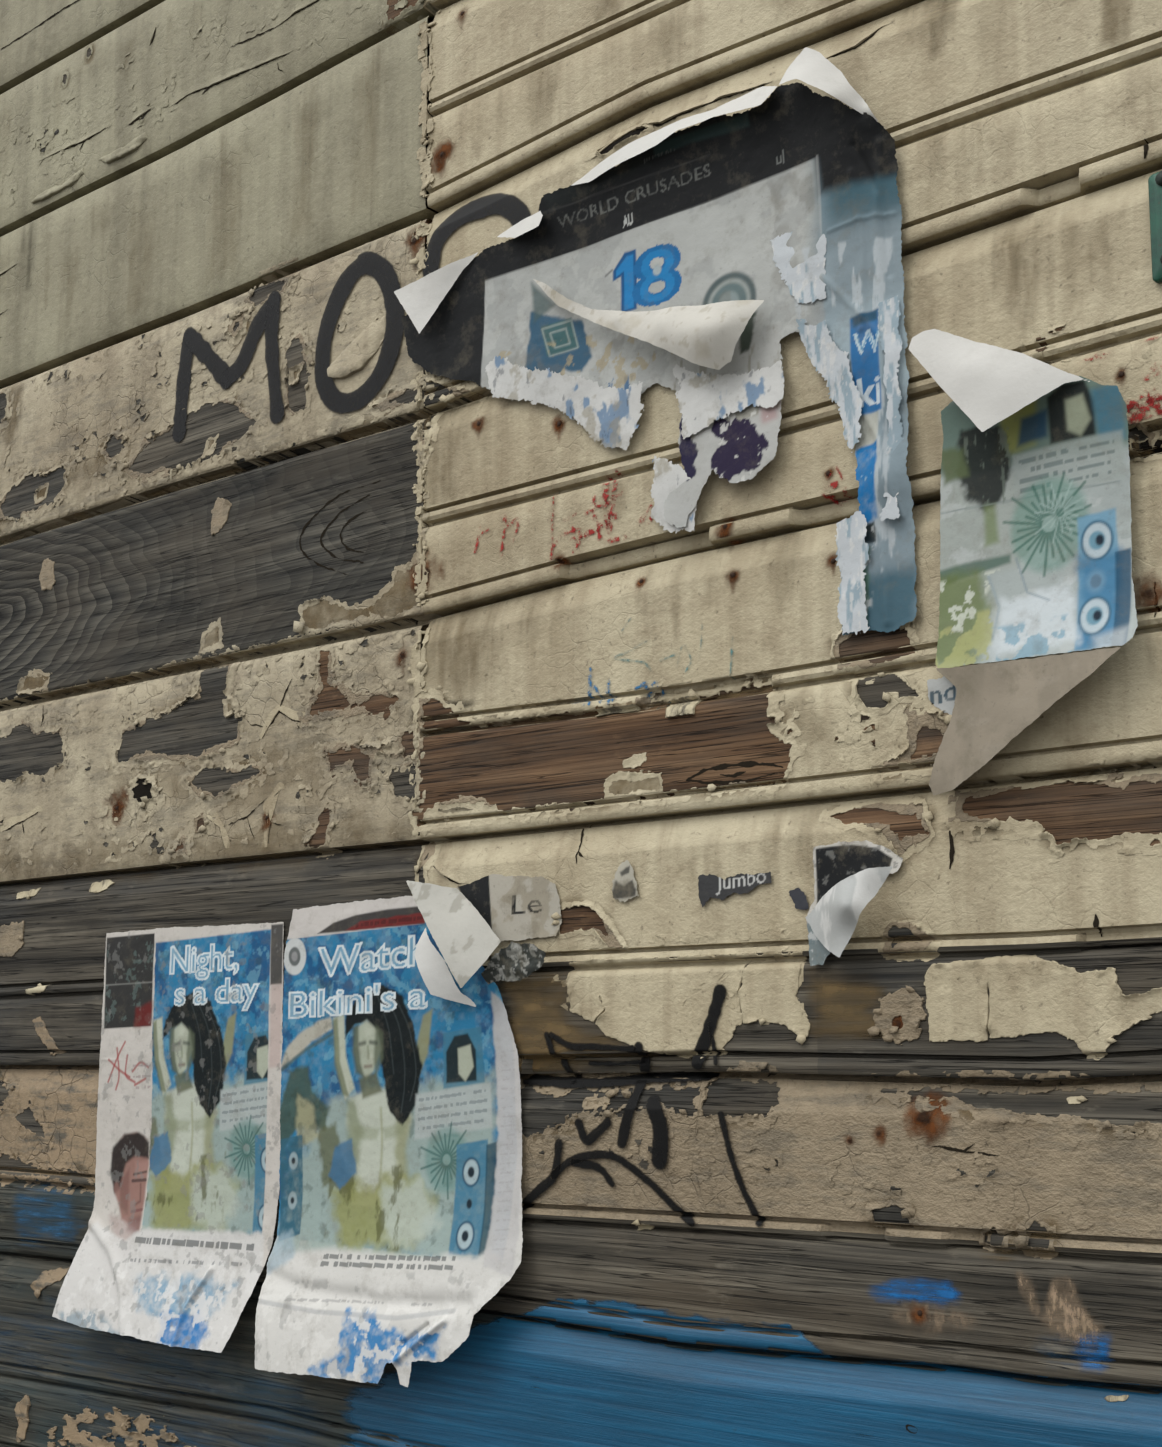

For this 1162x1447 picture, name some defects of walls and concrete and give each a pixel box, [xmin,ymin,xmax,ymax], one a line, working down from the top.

crack [1,0,79,49]
peeling [377,0,438,37]
crack [37,0,319,162]
peeling [0,222,1162,896]
peeling [538,900,806,1025]
peeling [867,1008,899,1042]
peeling [0,1067,95,1195]
peeling [520,1061,799,1226]
rust [907,1094,949,1141]
peeling [854,1055,1162,1144]
peeling [865,1199,924,1237]
peeling [978,1211,1059,1260]